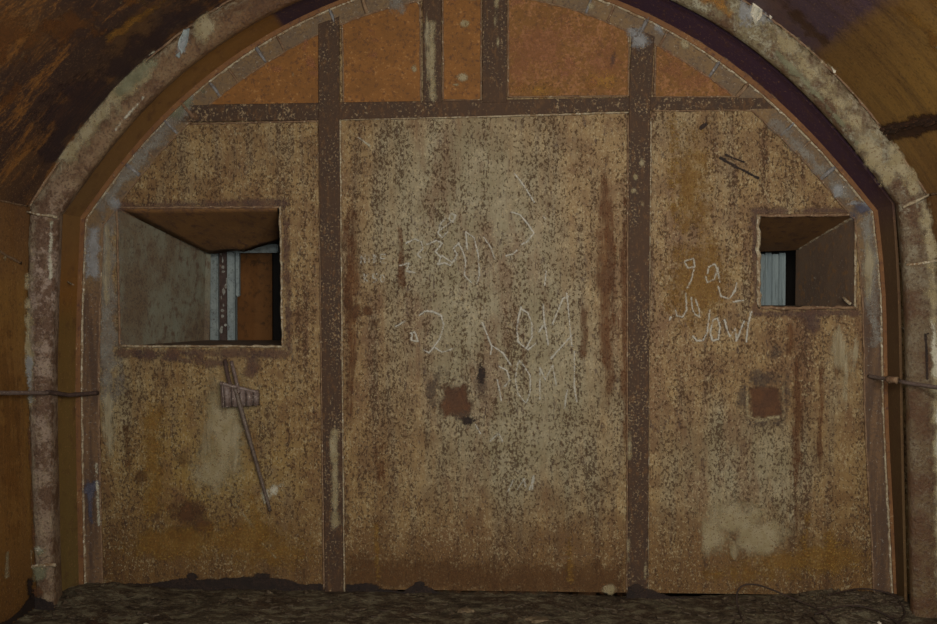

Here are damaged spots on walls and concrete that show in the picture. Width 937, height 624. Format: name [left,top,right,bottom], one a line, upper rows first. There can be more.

peeling [776,29,937,195]
corrosion [597,178,627,402]
corrosion [427,367,486,424]
corrosion [739,362,802,480]